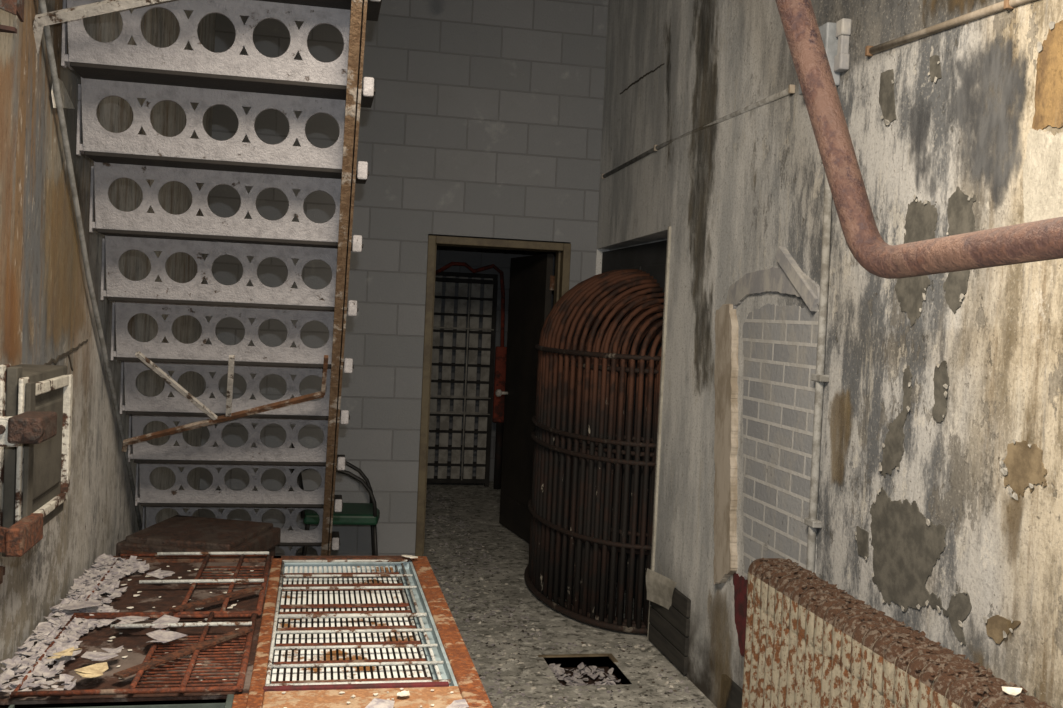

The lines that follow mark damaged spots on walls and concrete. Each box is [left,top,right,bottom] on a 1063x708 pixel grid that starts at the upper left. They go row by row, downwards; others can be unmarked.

water stain [688,0,717,388]
water stain [910,105,935,190]
water stain [945,38,1026,206]
flaking render [1022,20,1063,223]
peeling [854,360,972,645]
spalling [999,439,1047,500]
spalling [983,615,1021,644]